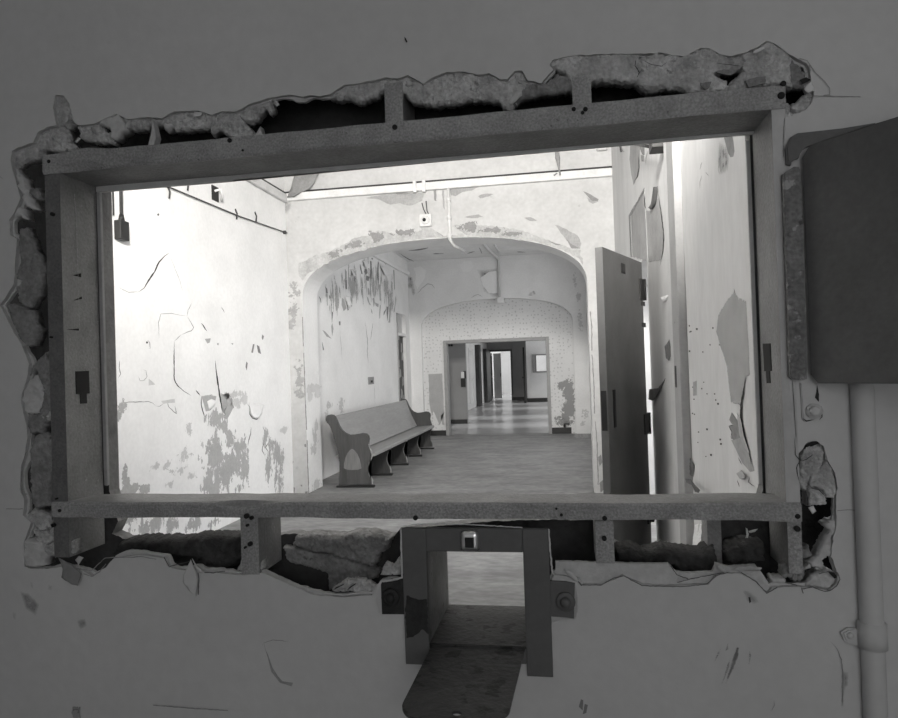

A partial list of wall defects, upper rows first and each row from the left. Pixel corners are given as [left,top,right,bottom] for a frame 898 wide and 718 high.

flaking render [330,42,830,117]
peeling [287,174,318,198]
peeling [368,187,493,209]
peeling [619,145,664,264]
flaking render [6,96,279,597]
crack [119,253,207,394]
crack [215,361,227,414]
peeling [288,214,583,350]
peeling [150,390,322,494]
peeling [729,413,754,485]
peeling [692,524,702,545]
flaking render [741,441,840,594]